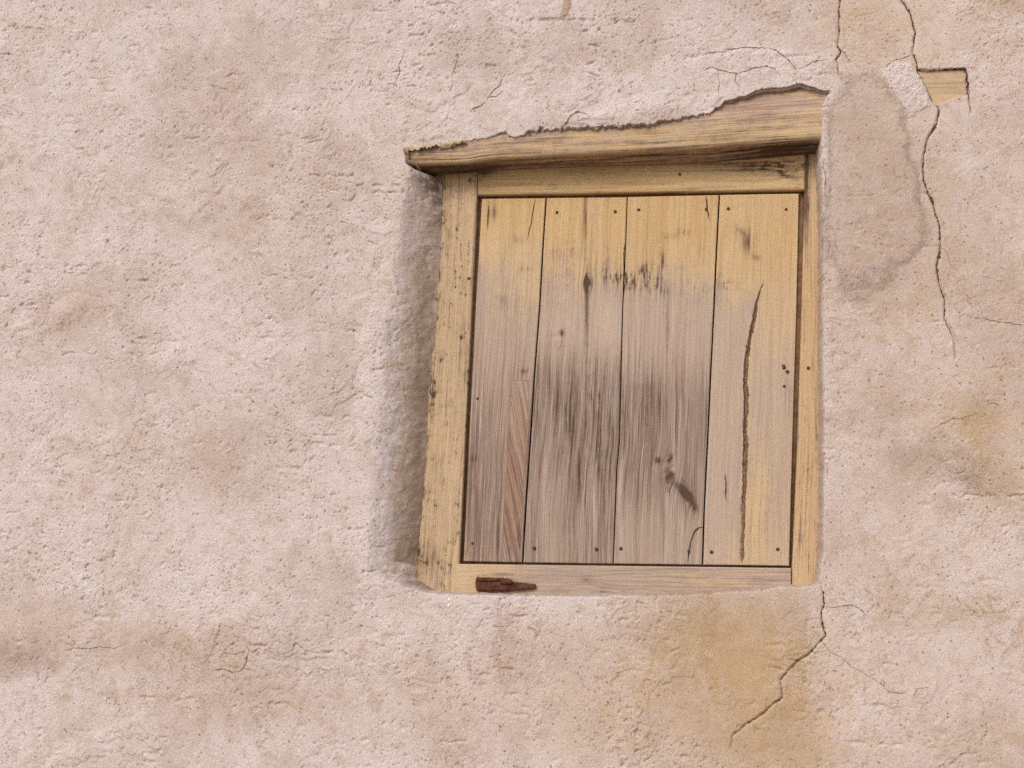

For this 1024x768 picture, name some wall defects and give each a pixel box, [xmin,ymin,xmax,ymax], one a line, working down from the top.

crack [515,0,847,137]
crack [889,0,971,358]
crack [731,587,927,745]